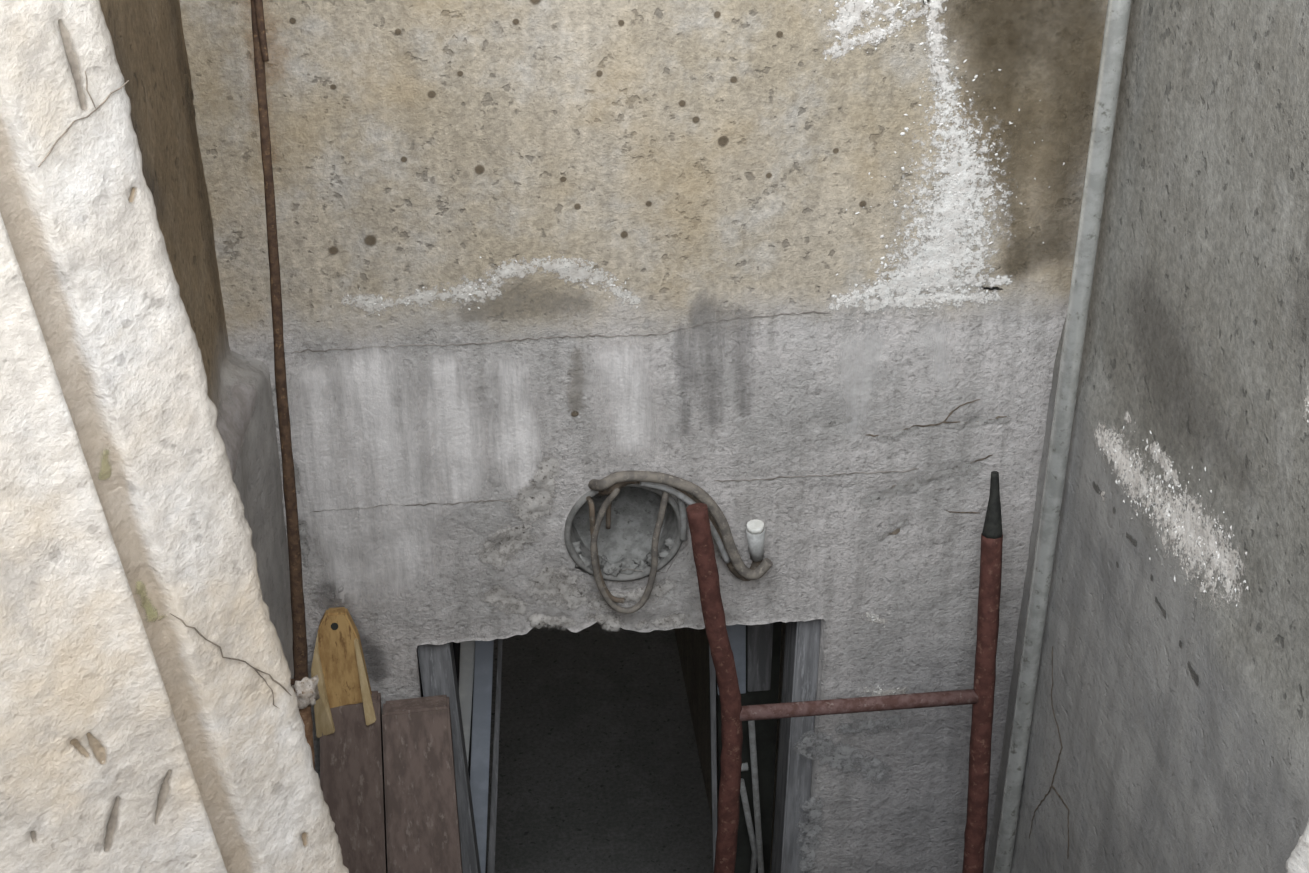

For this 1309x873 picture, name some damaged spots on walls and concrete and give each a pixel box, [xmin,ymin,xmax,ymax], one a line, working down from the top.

crack [38,71,128,167]
damp [819,0,1098,323]
damp [341,256,641,318]
damp [600,343,652,452]
damp [291,346,540,601]
damp [1094,411,1248,607]
crack [171,614,291,708]